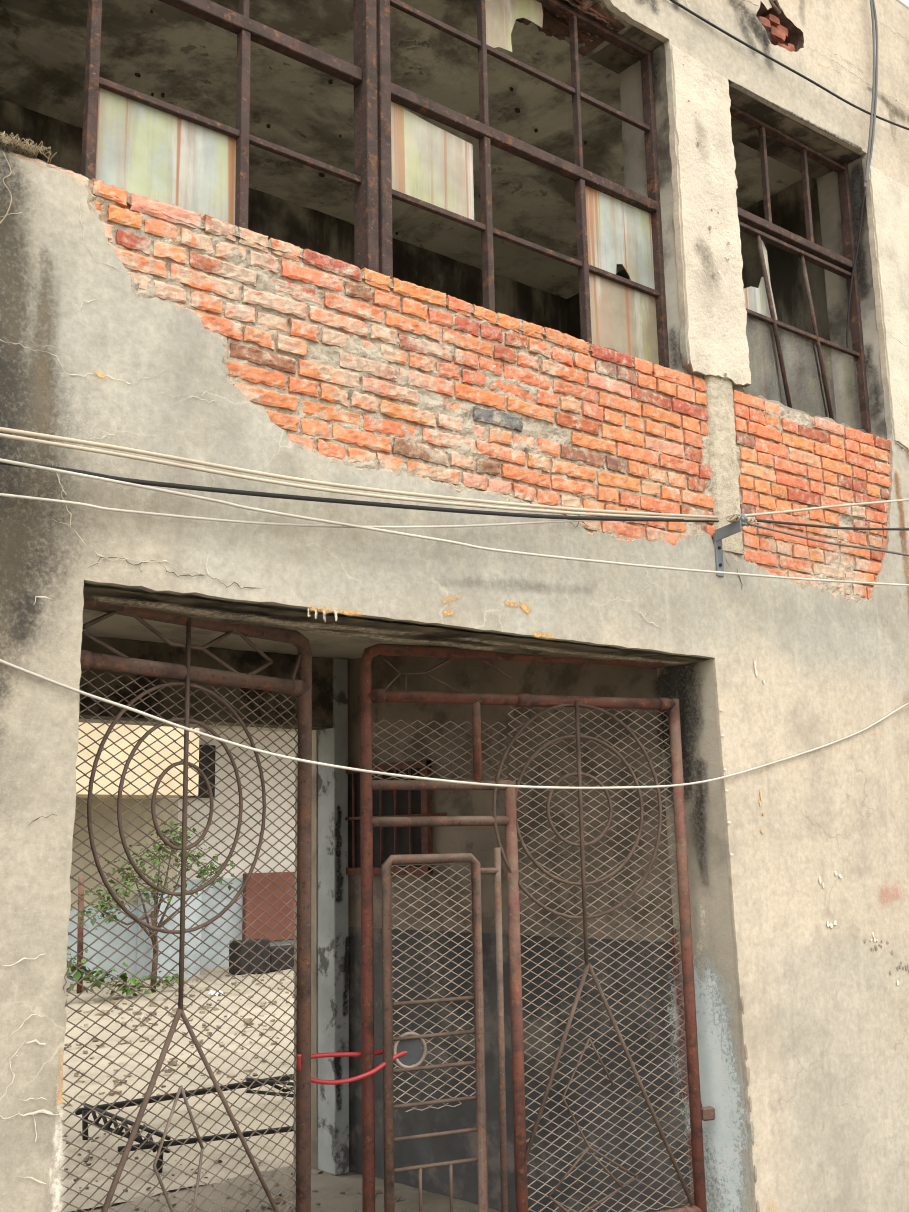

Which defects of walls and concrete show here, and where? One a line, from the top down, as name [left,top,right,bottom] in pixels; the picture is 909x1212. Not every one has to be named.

spalling [757,0,795,52]
water stain [0,148,55,640]
flaking render [9,152,891,602]
crack [52,474,262,589]
corrosion [895,472,909,597]
crack [0,953,72,1142]